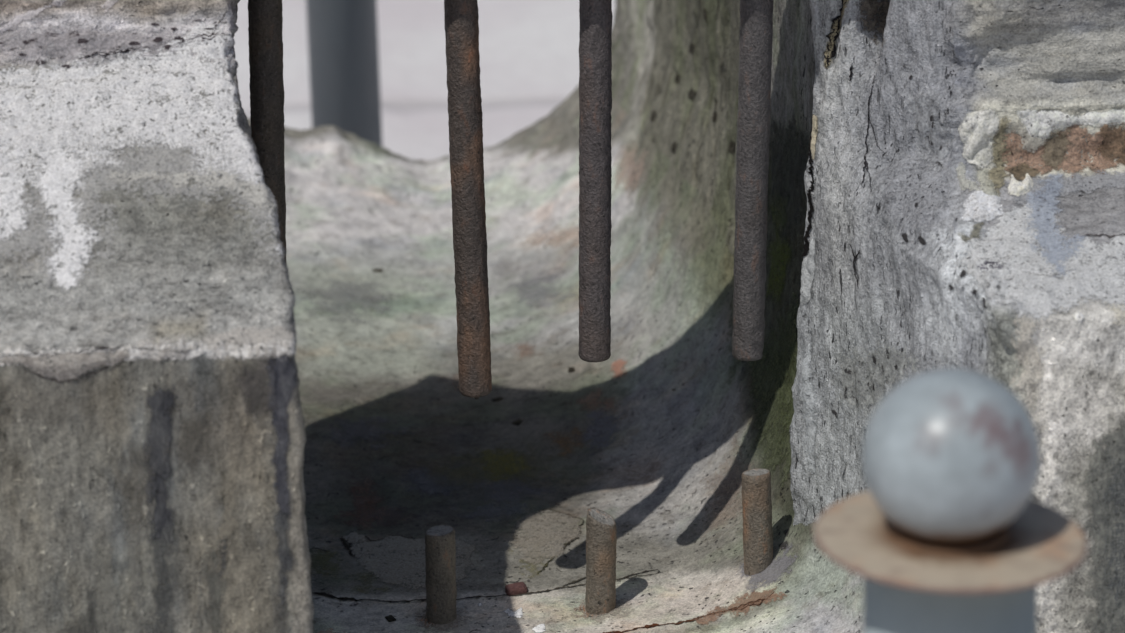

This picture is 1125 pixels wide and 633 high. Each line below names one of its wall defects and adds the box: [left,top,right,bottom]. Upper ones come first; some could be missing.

water stain [0,14,286,306]
crack [823,0,881,192]
spalling [904,89,953,171]
spalling [956,117,1125,196]
water stain [138,322,297,633]
crack [314,591,426,603]
crack [456,577,586,600]
crack [616,569,659,580]